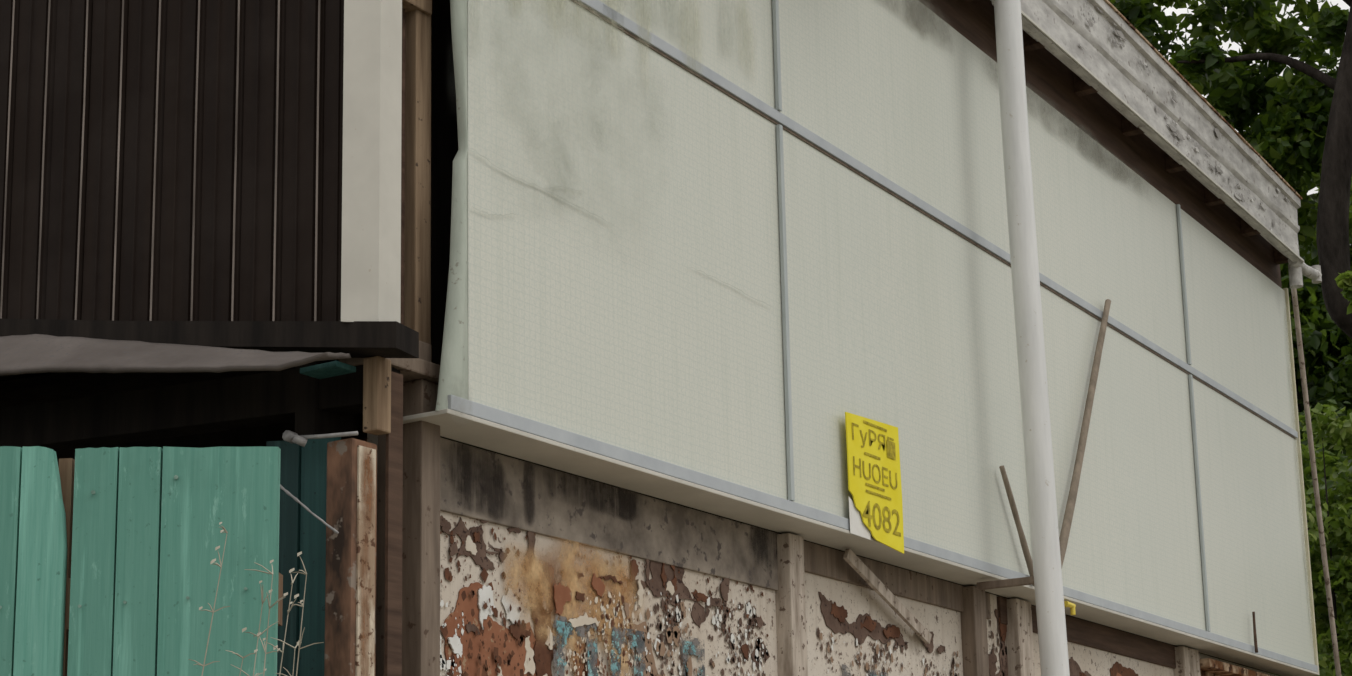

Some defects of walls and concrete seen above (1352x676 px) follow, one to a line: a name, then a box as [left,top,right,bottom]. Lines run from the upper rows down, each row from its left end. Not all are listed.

peeling [440,515,774,676]
peeling [814,592,959,676]
peeling [1069,657,1091,676]
peeling [1110,662,1138,676]